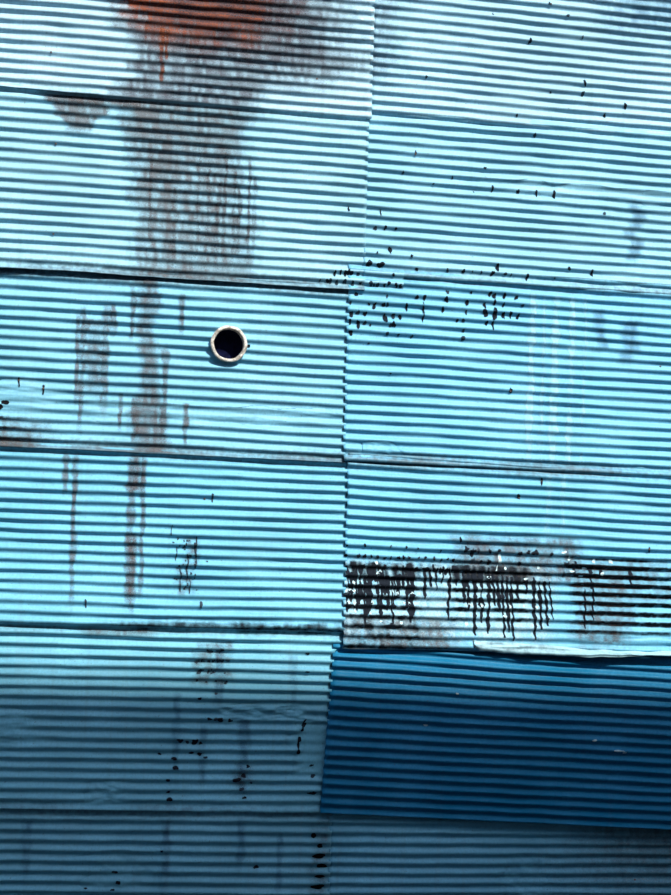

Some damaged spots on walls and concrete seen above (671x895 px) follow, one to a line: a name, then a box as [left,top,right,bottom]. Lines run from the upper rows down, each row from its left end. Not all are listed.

corrosion [112,0,350,106]
leakage [562,551,671,642]